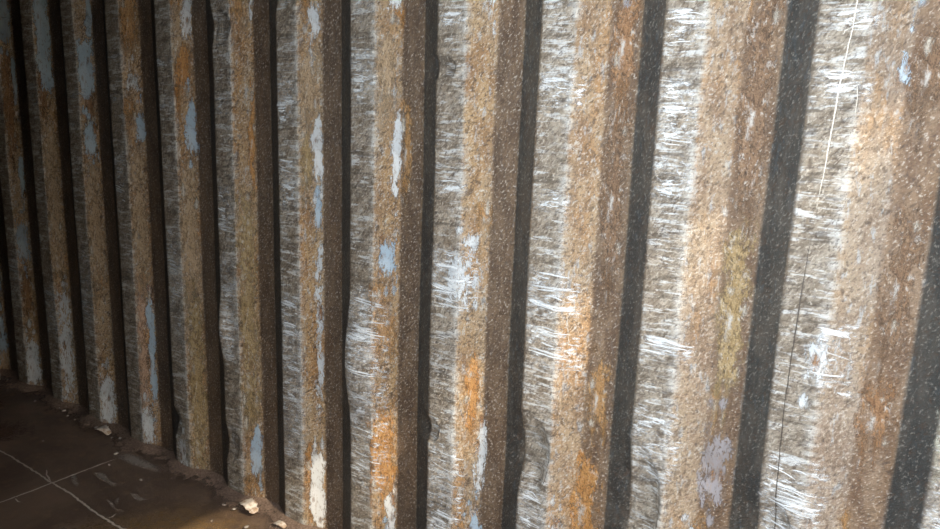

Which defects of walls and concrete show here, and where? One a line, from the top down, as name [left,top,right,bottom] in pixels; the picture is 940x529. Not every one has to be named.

corrosion [126,145,154,441]
corrosion [366,402,400,512]
corrosion [463,352,482,447]
corrosion [568,348,611,529]
corrosion [596,0,643,301]
corrosion [710,0,785,436]